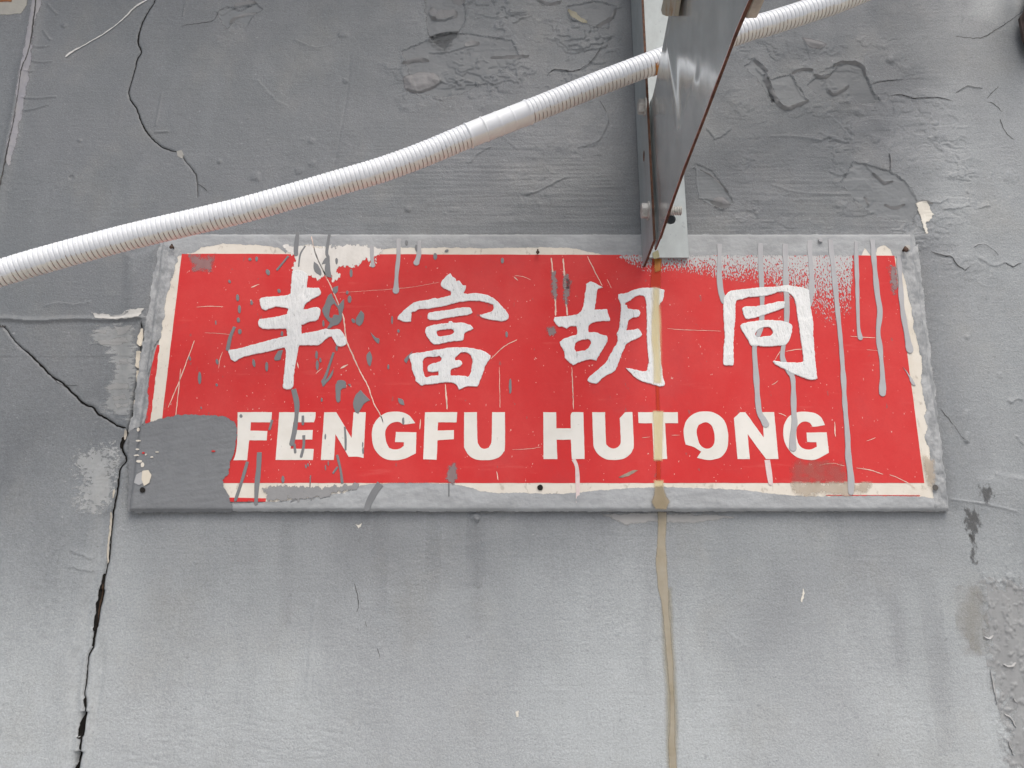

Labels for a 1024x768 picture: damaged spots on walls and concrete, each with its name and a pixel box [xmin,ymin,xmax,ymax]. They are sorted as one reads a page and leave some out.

crack [0,0,41,185]
crack [128,0,207,197]
peeling [402,0,529,97]
peeling [744,60,879,110]
peeling [916,200,934,234]
crack [0,324,143,768]
rust [650,258,677,768]
damp [964,509,981,564]
flaking render [977,577,1024,768]